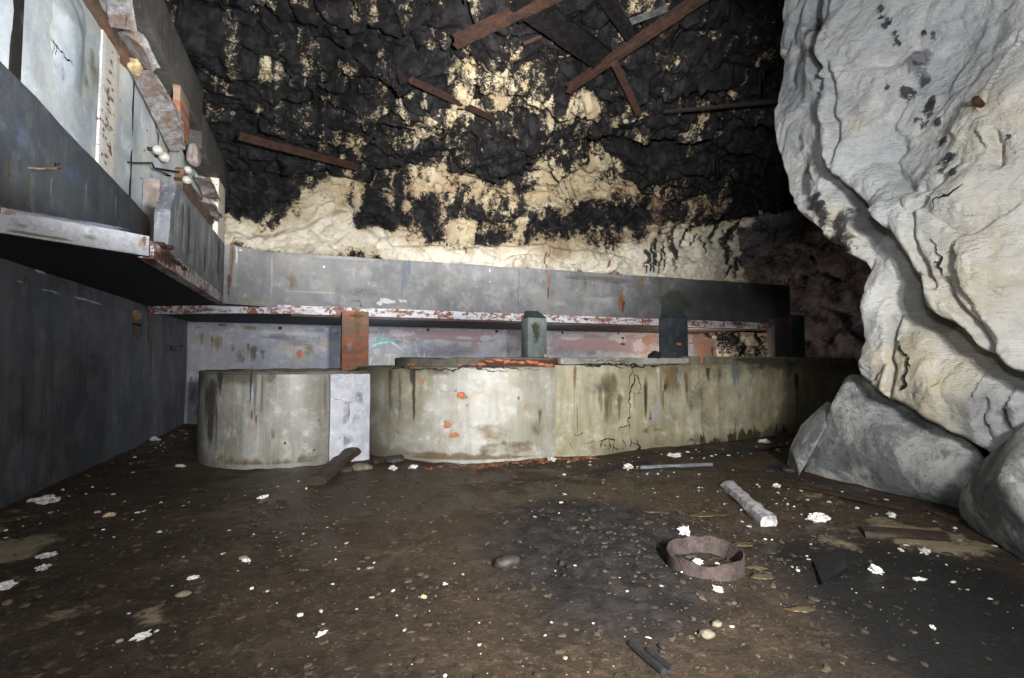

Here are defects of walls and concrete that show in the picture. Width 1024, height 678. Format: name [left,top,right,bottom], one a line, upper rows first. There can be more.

peeling [374,328,655,367]
damp [197,372,223,441]
crack [570,359,703,452]